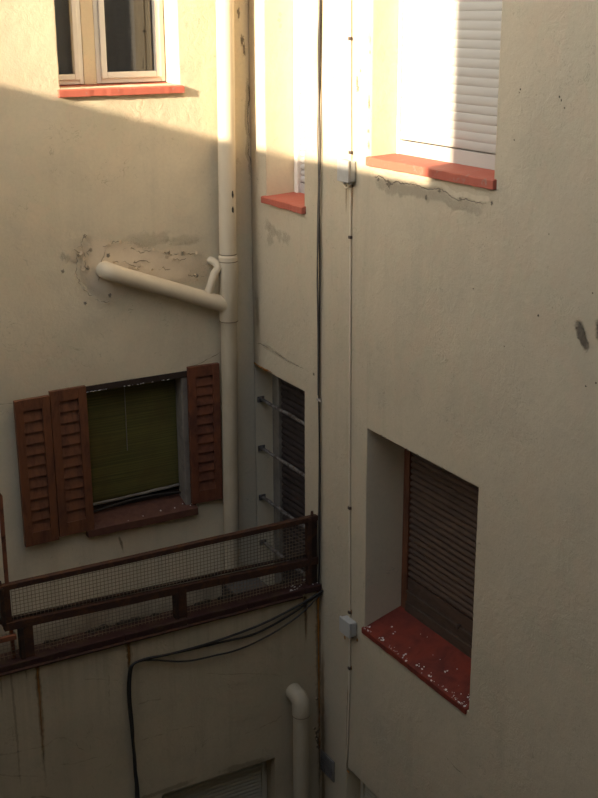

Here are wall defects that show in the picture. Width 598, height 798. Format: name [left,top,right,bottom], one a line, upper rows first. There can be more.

peeling [62,233,210,306]